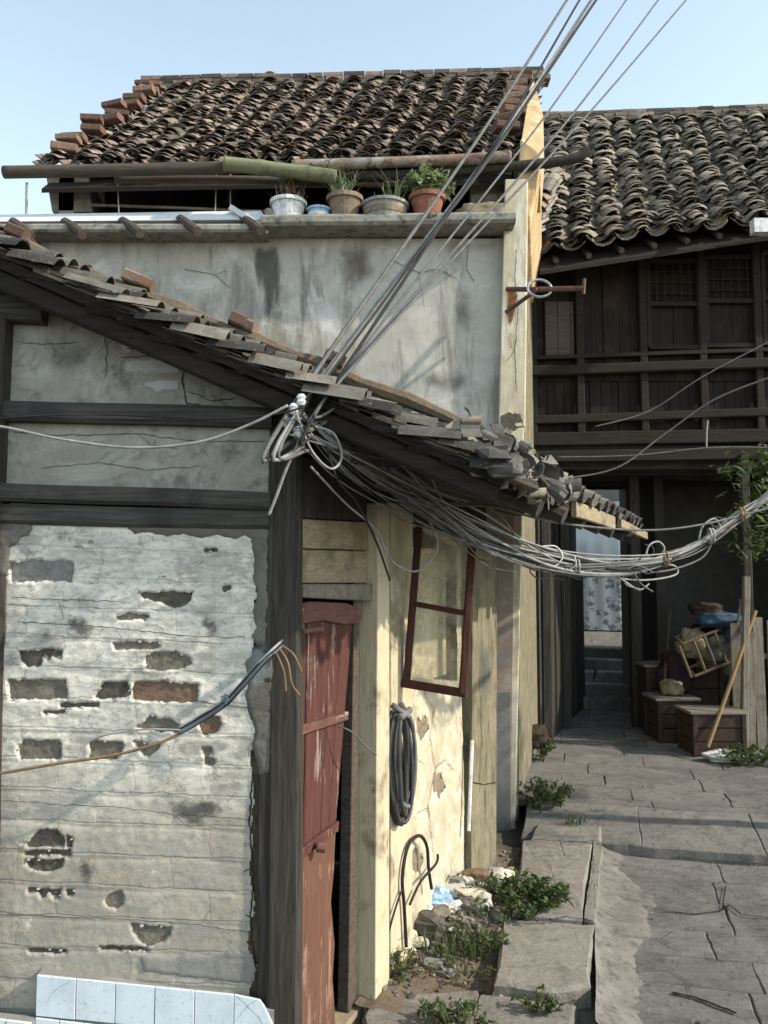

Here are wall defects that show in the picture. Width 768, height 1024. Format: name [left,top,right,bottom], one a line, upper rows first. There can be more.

water stain [255,249,278,313]
rust [507,292,517,348]
crack [102,338,150,378]
crack [181,349,239,405]
crack [12,431,260,471]
flaking render [11,558,74,583]
flaking render [113,612,149,622]
flaking render [134,590,193,608]
flaking render [7,640,199,762]
peeling [416,711,431,744]
peeling [432,771,448,798]
crack [640,857,768,1014]